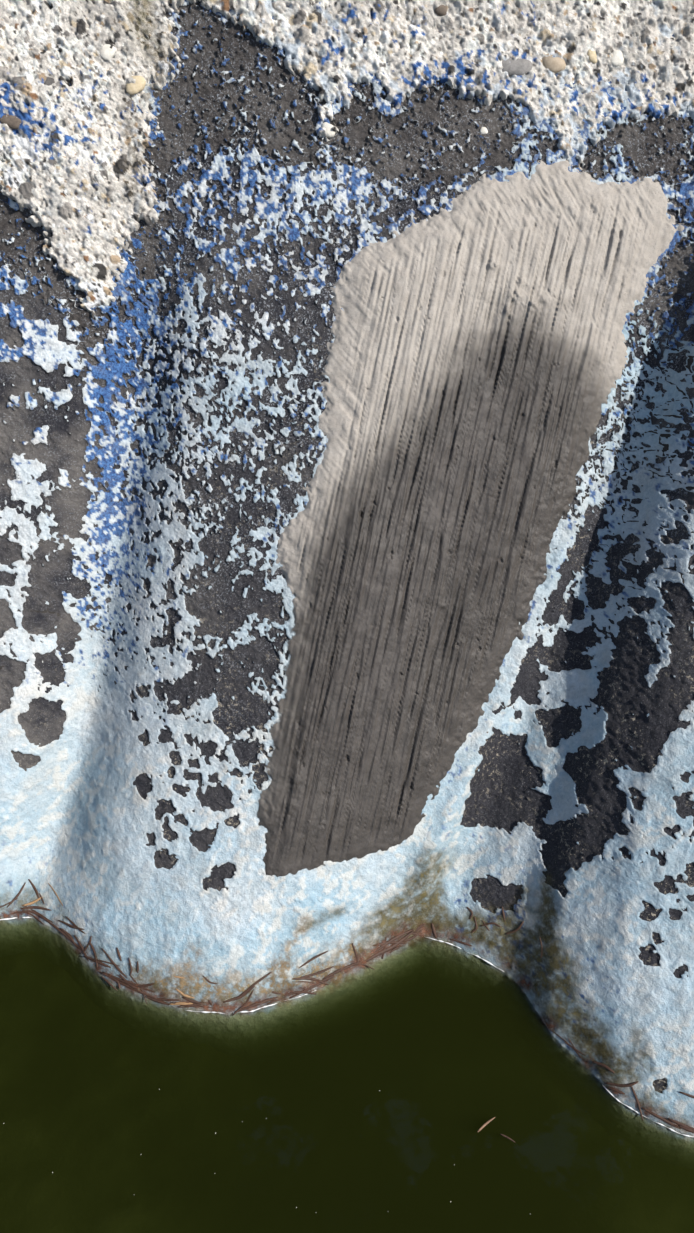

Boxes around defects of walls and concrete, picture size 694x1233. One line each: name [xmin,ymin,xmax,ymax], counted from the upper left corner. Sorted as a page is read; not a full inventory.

peeling [0,1,694,966]
leakage [0,908,40,920]
leakage [94,962,324,1014]
leakage [341,923,510,974]
peeling [673,964,689,978]
peeling [653,1078,667,1094]